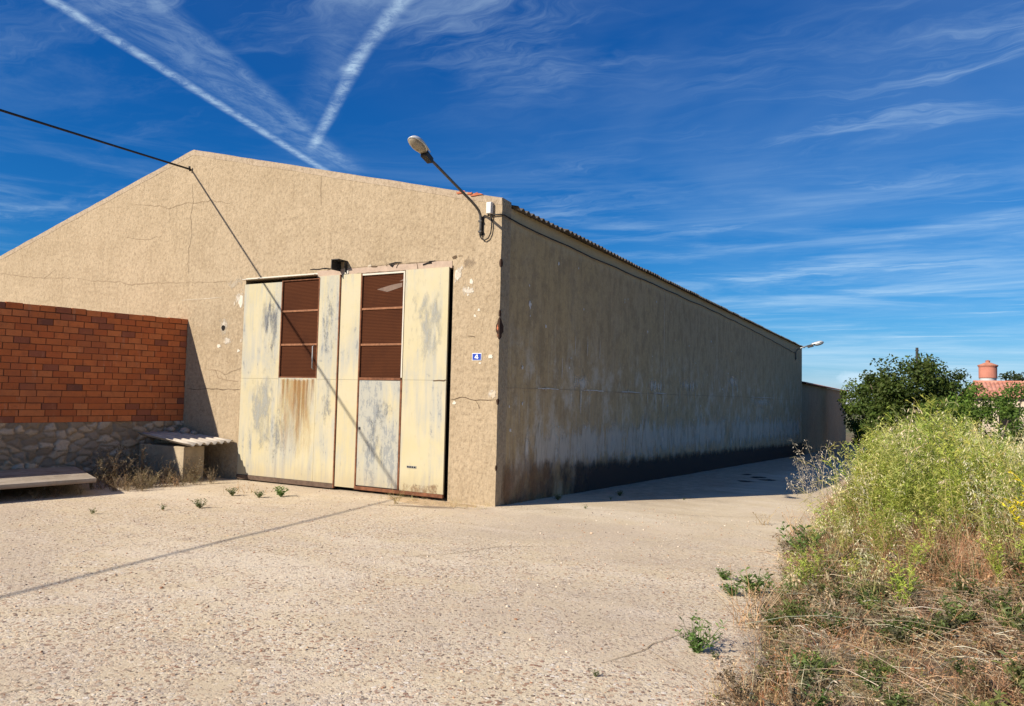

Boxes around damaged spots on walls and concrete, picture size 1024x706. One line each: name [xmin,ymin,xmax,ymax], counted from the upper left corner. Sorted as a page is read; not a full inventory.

crack [0,185,232,288]
damp [525,399,805,495]